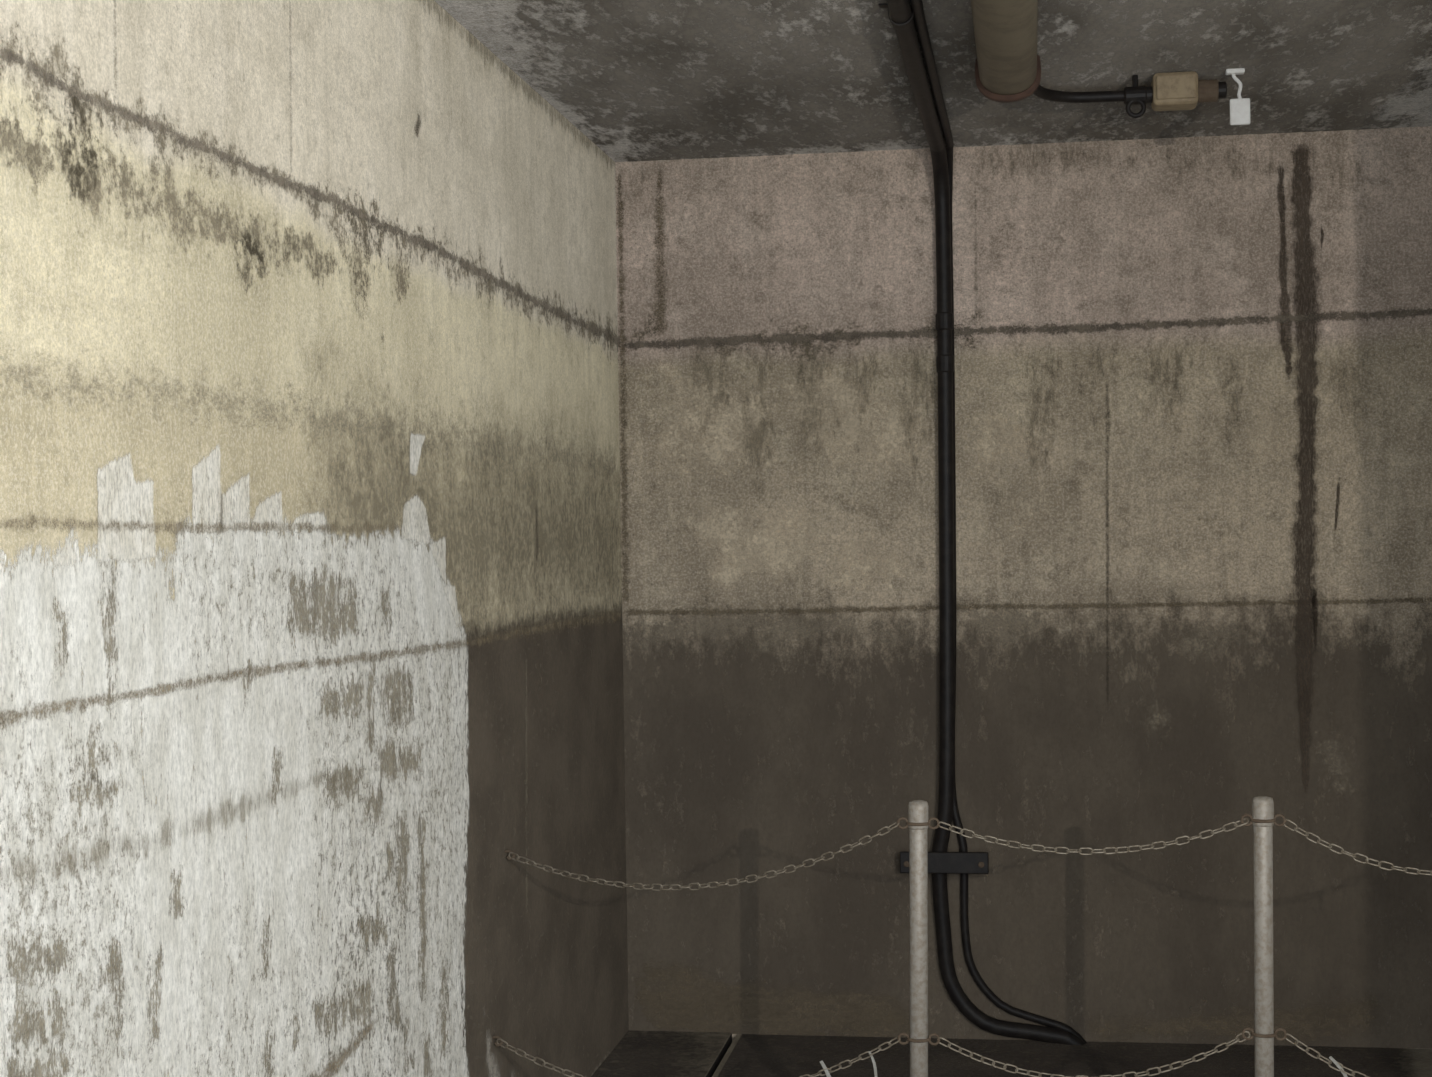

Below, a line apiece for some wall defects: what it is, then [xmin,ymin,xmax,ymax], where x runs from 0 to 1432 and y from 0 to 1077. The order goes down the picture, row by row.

water stain [0,25,658,360]
water stain [507,0,1432,162]
peeling [0,446,469,1077]
peeling [410,433,425,474]
water stain [0,420,940,1077]
water stain [659,317,923,478]
water stain [928,148,1432,1077]